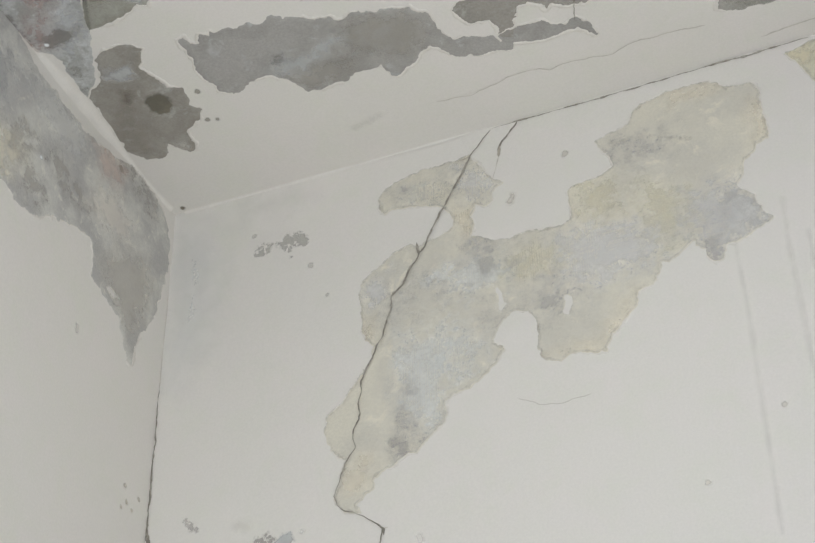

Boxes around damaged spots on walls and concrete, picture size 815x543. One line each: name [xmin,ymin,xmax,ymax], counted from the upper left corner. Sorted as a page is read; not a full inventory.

peeling [0,0,219,367]
spalling [174,0,600,95]
peeling [324,80,776,515]
crack [333,18,815,543]
spalling [712,0,777,12]
peeling [783,39,815,82]